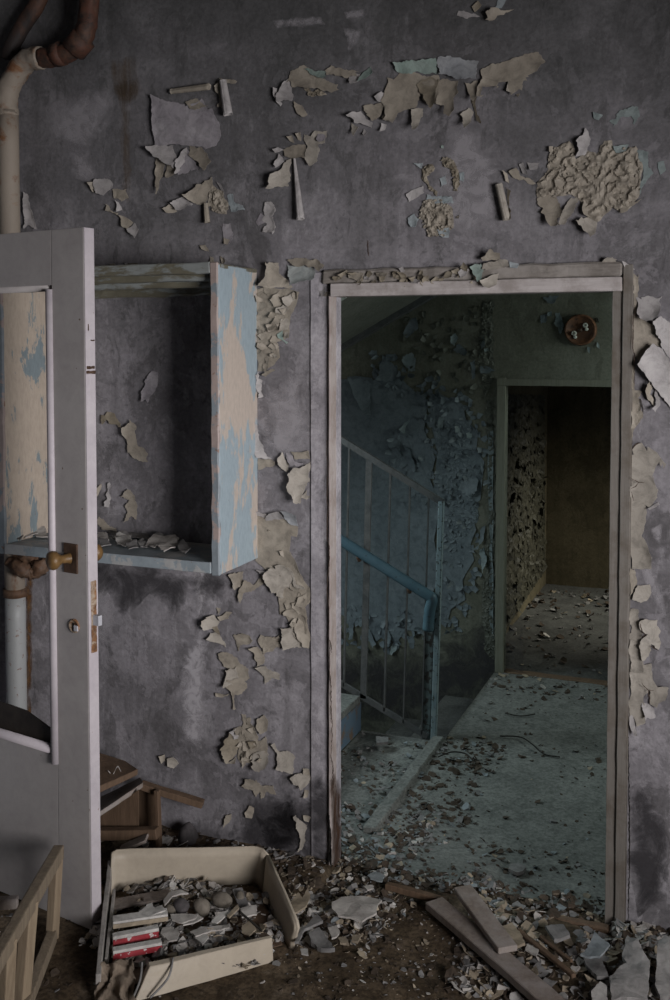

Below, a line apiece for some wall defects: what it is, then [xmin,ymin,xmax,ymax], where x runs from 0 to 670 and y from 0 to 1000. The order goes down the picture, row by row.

peeling [273,65,373,117]
peeling [346,52,545,136]
peeling [145,78,245,245]
peeling [406,145,464,238]
peeling [319,249,519,297]
peeling [255,258,324,398]
peeling [141,371,159,403]
peeling [97,483,137,532]
peeling [101,412,148,462]
peeling [341,305,548,659]
peeling [602,257,670,736]
peeling [201,422,311,819]